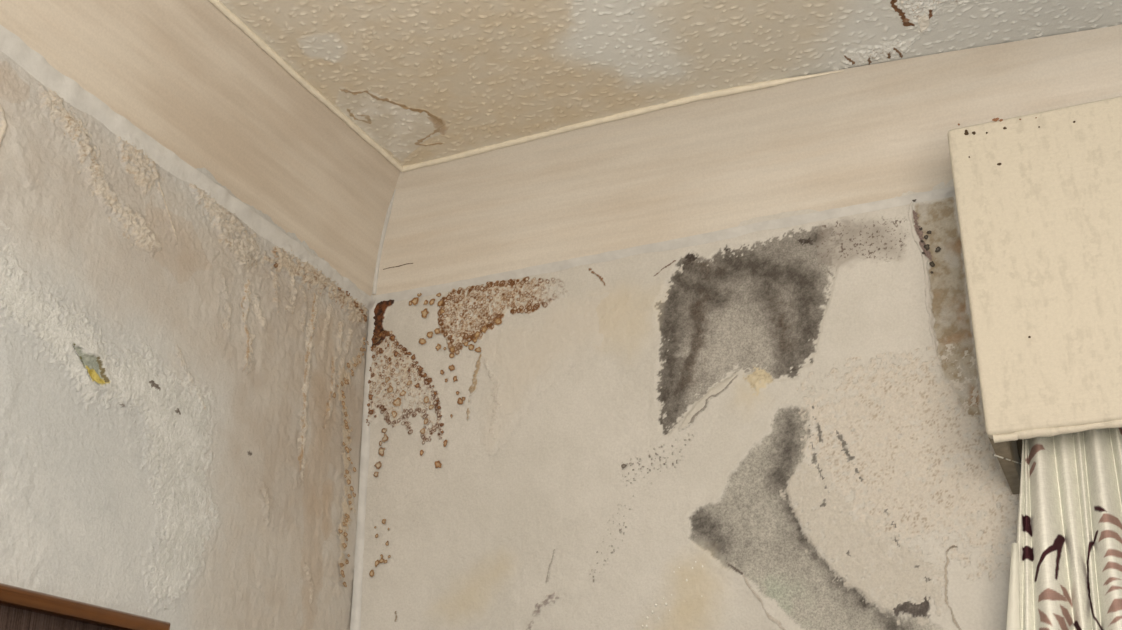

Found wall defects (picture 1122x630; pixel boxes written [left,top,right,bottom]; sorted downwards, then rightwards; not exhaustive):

water stain [219,0,870,166]
peeling [838,0,985,70]
water stain [0,51,672,630]